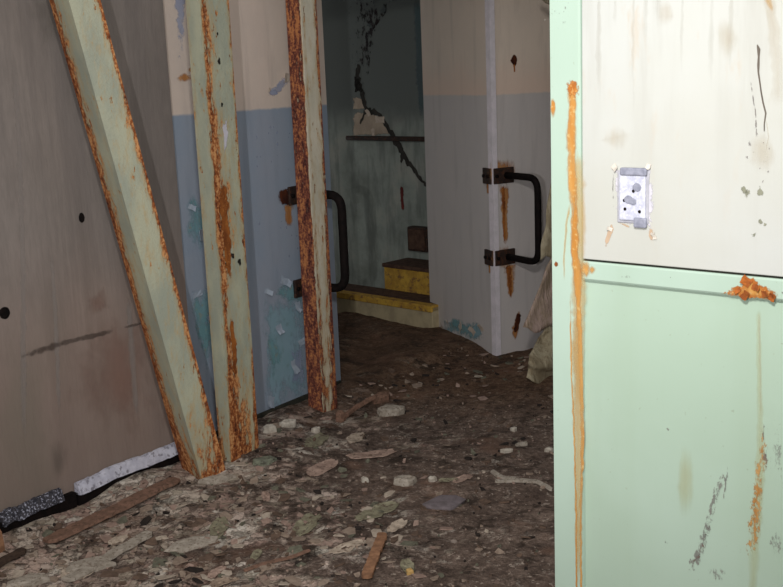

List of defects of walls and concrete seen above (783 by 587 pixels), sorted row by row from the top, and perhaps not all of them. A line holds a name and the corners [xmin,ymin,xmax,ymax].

crack [355,64,426,187]
corrosion [219,185,231,276]
peeling [265,276,305,408]
corrosion [506,265,515,296]
corrosion [512,313,521,338]
corrosion [567,80,594,587]
corrosion [725,274,776,302]